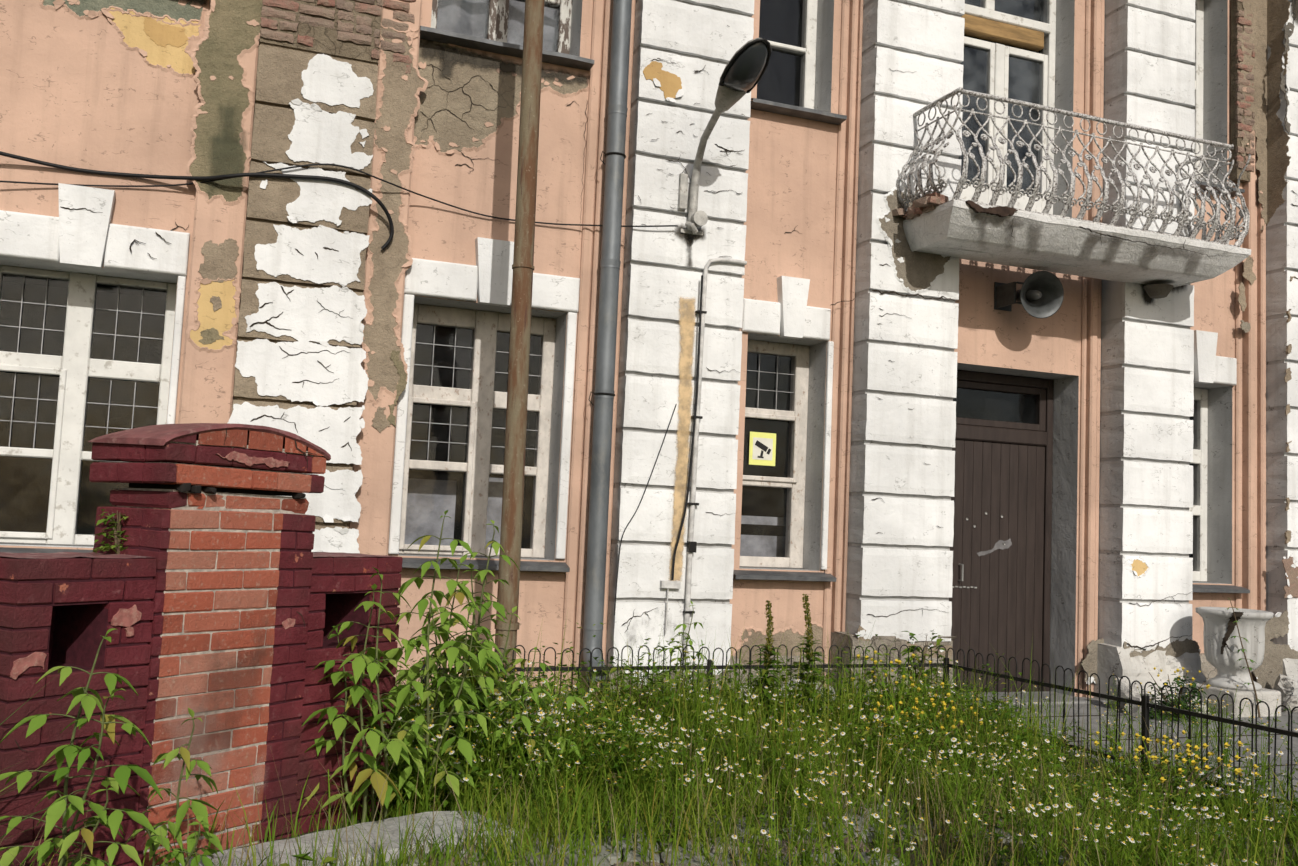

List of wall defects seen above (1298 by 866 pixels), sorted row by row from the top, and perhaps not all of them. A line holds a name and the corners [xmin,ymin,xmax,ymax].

peeling [541,70,589,98]
peeling [643,58,700,104]
crack [418,63,505,174]
peeling [1231,0,1295,231]
flaking render [876,187,1018,294]
peeling [39,0,522,553]
spalling [1284,344,1292,383]
peeling [111,605,142,637]
flaking render [1252,530,1298,690]
peeling [10,652,47,680]
peeling [1081,638,1104,684]
peeling [1123,636,1201,662]